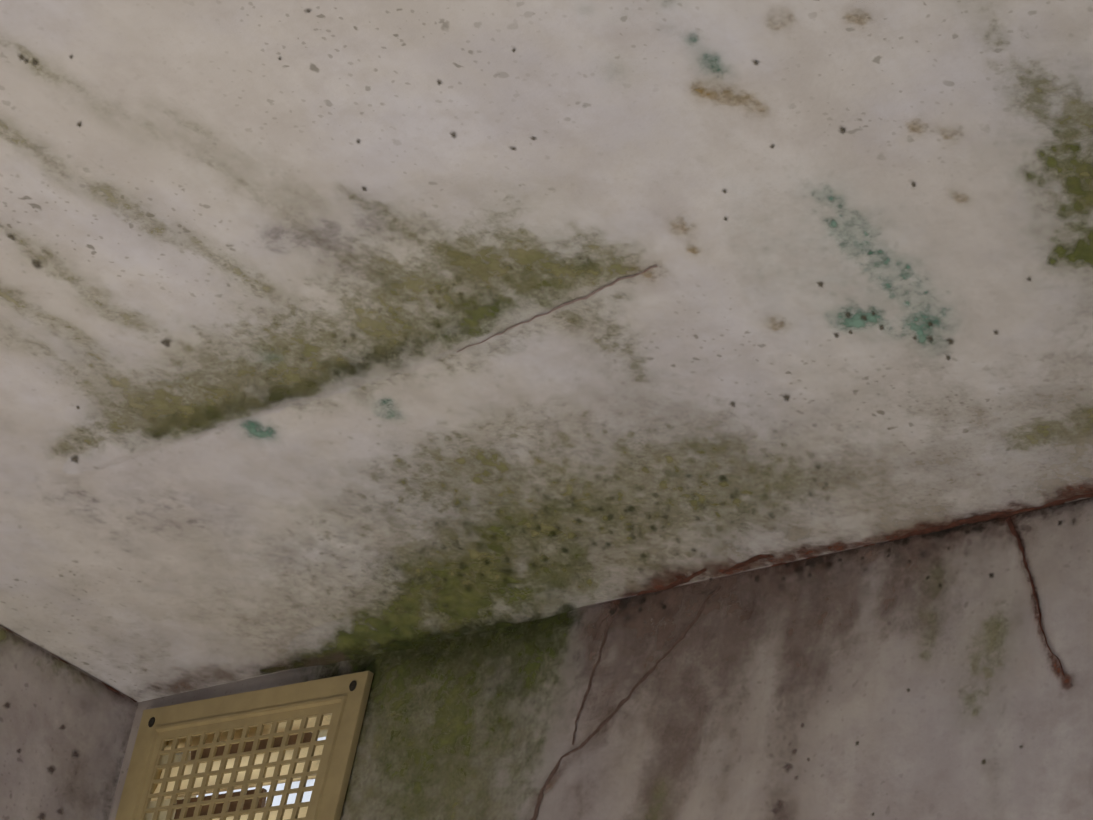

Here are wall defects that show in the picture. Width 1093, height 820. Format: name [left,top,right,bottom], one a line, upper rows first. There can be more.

leakage [244,421,275,438]
crack [530,586,721,820]
leakage [579,508,859,772]
leakage [811,459,956,617]